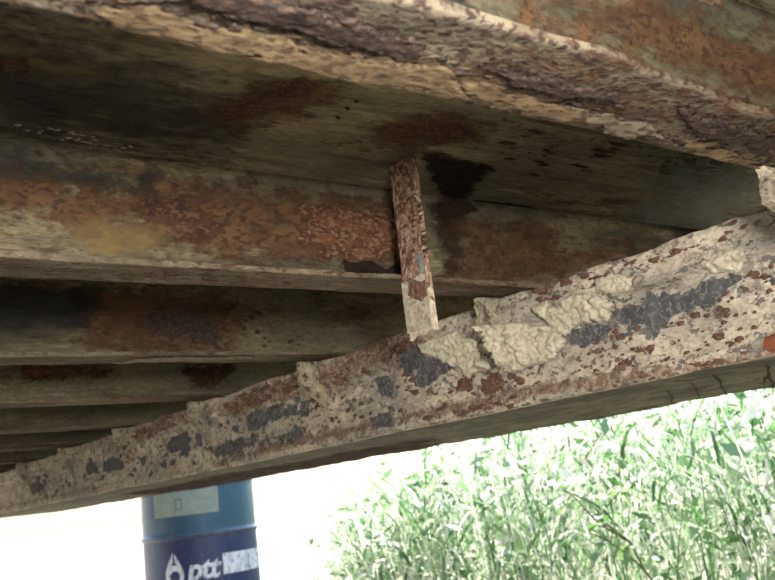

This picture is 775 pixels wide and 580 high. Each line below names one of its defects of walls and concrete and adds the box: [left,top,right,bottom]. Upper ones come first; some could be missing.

corrosion [189,0,448,64]
corrosion [517,0,538,27]
corrosion [573,12,596,43]
corrosion [195,76,350,136]
peeling [92,0,760,169]
corrosion [477,61,626,115]
corrosion [649,104,775,176]
corrosion [0,113,695,303]
corrosion [17,364,115,382]
corrosion [382,265,775,427]
peeling [26,397,310,500]
corrosion [131,333,444,495]